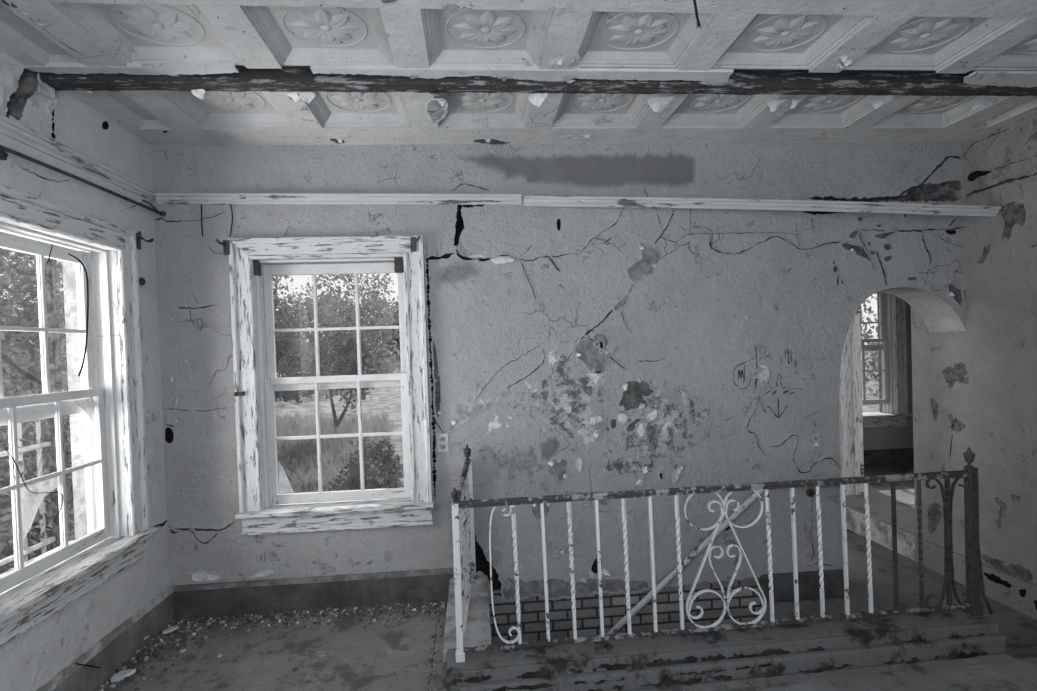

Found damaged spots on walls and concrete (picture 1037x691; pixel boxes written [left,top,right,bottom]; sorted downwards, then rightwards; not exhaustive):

spalling [6,68,61,125]
crack [5,0,1037,140]
spalling [612,239,662,313]
crack [652,125,1037,287]
peeling [976,199,1030,266]
crack [152,517,235,544]
peeling [430,338,444,420]
crack [426,180,623,497]
crack [472,281,666,401]
peeling [470,331,710,521]
crack [744,395,842,568]
peeling [981,552,1037,612]